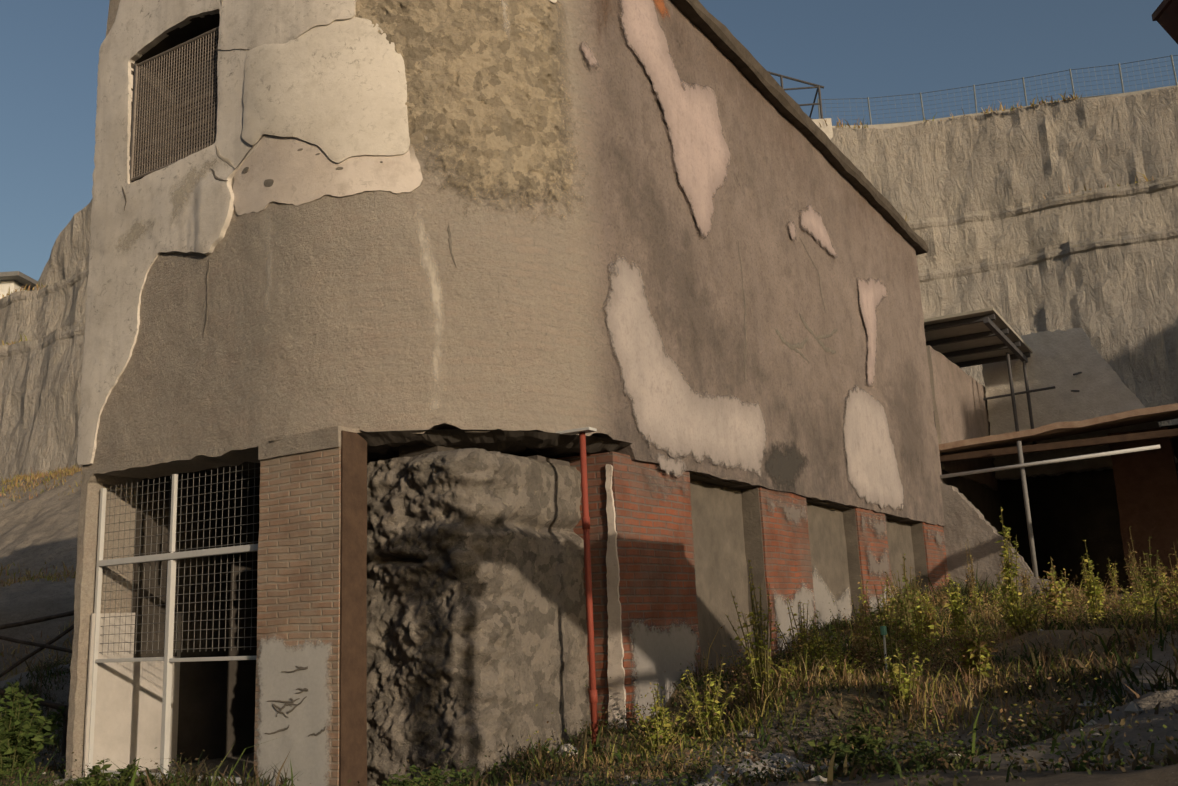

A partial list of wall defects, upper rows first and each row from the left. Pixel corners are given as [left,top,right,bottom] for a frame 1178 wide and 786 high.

crack [210,135,264,181]
flaking render [77,0,599,465]
flaking render [618,0,730,238]
flaking render [785,204,837,258]
flaking render [603,256,767,478]
flaking render [843,278,904,511]